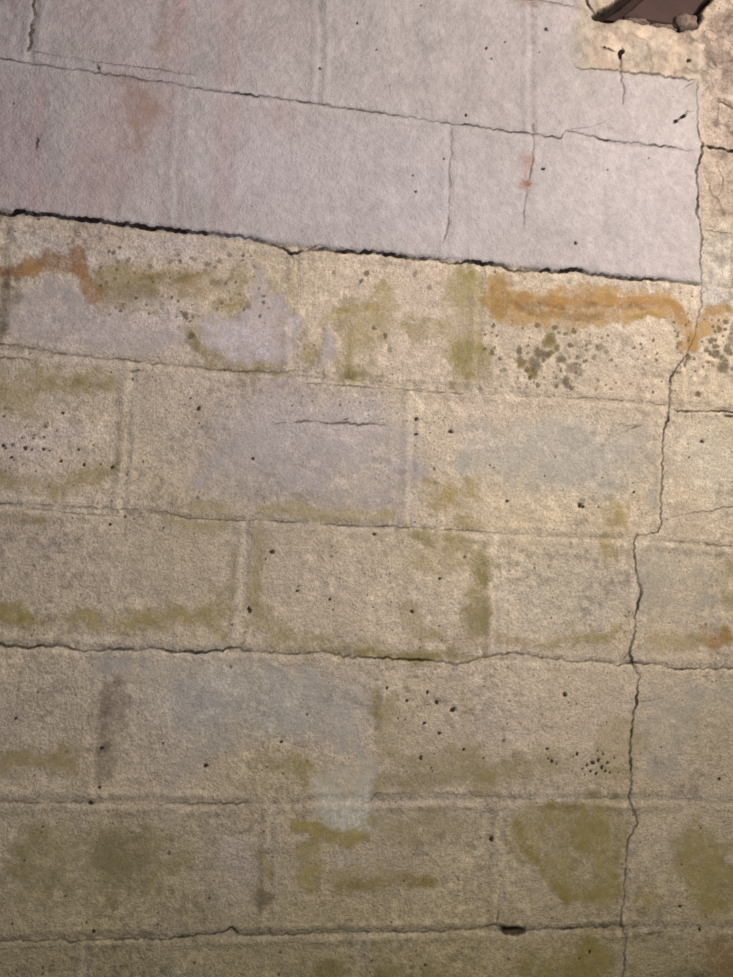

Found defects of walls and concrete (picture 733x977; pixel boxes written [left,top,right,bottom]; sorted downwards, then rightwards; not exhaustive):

spalling [600,0,709,33]
crack [674,114,733,286]
crack [0,209,664,282]
corrosion [0,246,103,299]
corrosion [481,275,729,351]
crack [619,357,733,817]
crack [0,642,83,652]
crack [160,646,249,654]
crack [341,653,430,661]
crack [159,926,239,940]
crack [559,923,607,931]